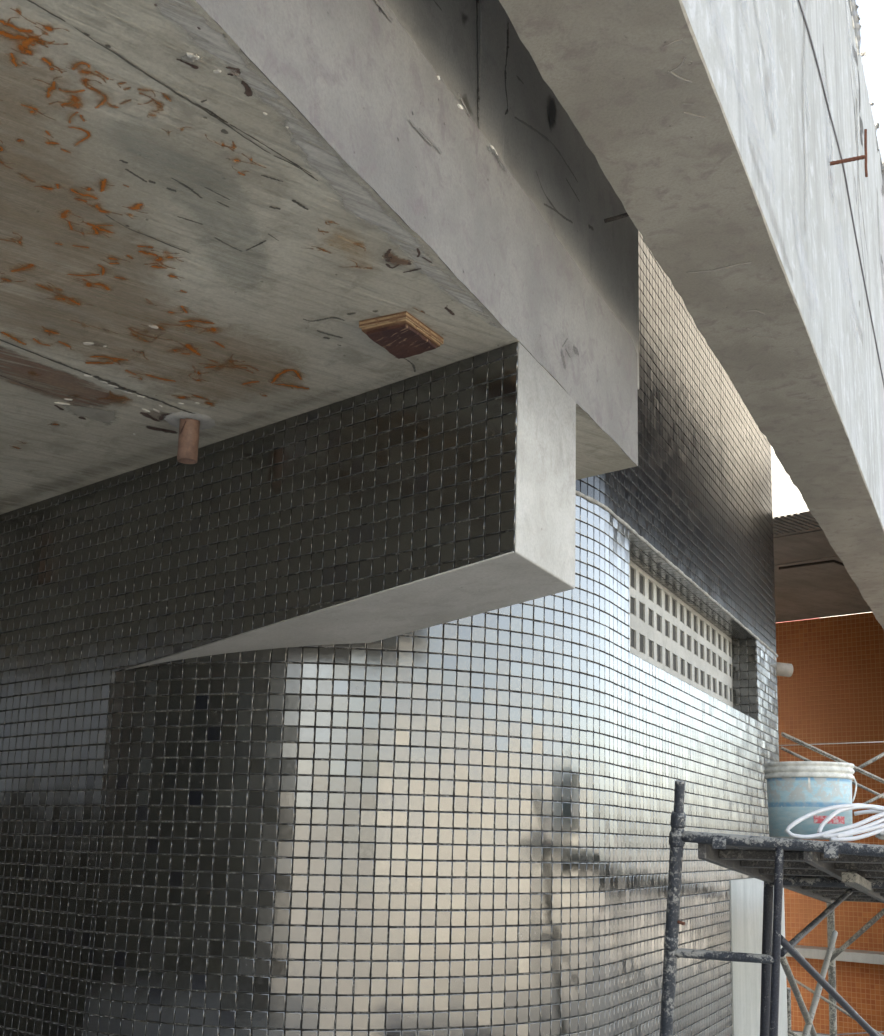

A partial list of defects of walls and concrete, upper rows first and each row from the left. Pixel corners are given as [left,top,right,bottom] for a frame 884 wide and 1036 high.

rust [0,140,144,248]
rust [0,8,171,153]
rust [67,245,187,293]
crack [106,215,191,254]
crack [27,0,318,210]
crack [119,160,279,252]
crack [473,0,481,121]
crack [505,23,594,230]
rust [830,129,868,178]
rust [71,301,309,396]